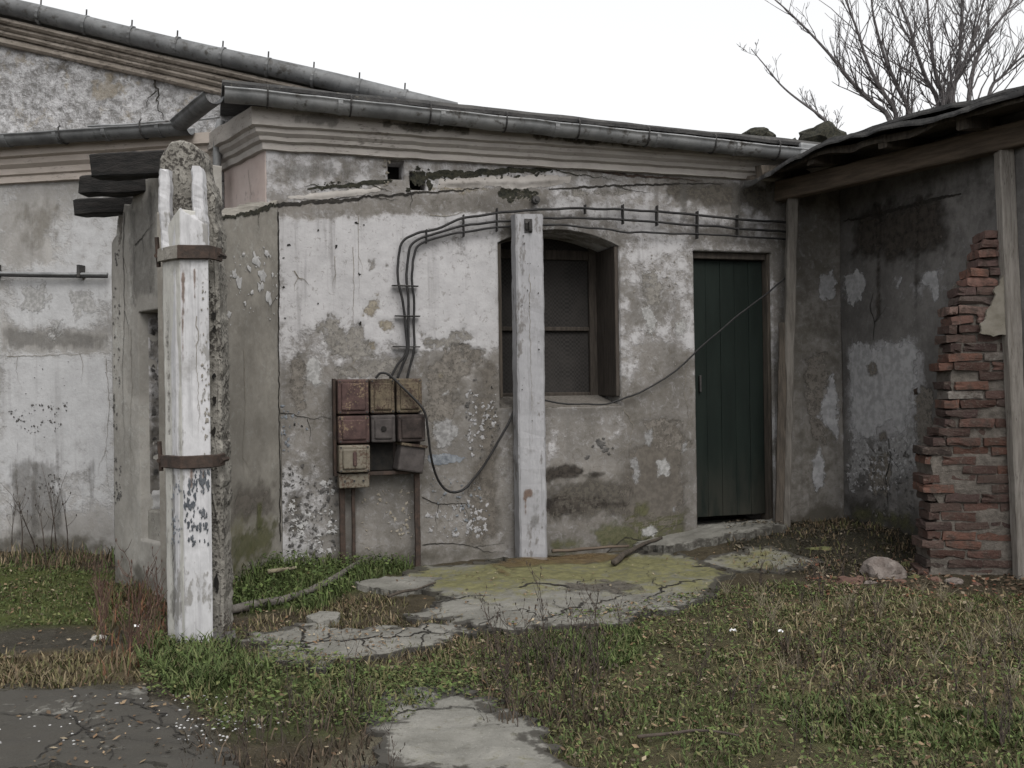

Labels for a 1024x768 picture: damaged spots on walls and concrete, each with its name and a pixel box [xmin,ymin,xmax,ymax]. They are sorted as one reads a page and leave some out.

crack [145,79,164,120]
peeling [230,247,278,320]
crack [222,167,724,541]
spalling [421,330,500,538]
spalling [844,385,934,519]
peeling [171,468,210,547]
peeling [282,464,339,559]